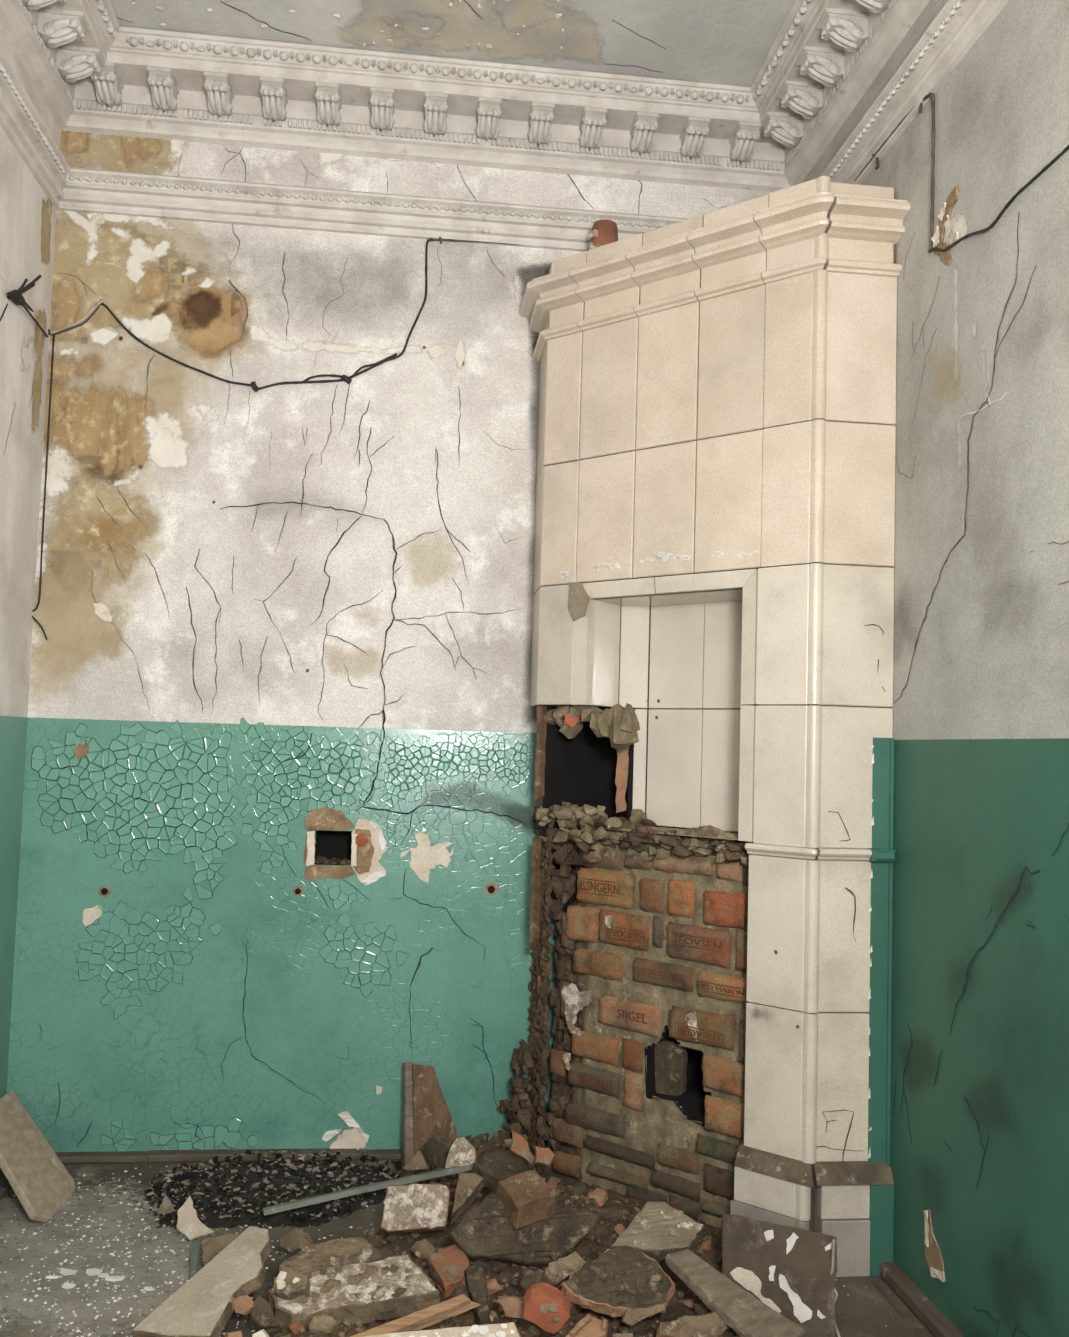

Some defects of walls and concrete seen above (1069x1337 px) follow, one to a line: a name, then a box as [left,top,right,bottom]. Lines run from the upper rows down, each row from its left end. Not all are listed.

crack [221,145,246,181]
spalling [931,185,959,265]
water stain [21,199,208,595]
crack [86,224,530,836]
crack [864,215,1037,708]
crack [221,944,314,1095]
spalling [304,807,454,886]
crack [281,845,486,1050]
crack [845,887,856,942]
crack [893,822,1069,1189]
crack [816,1110,854,1163]
peeling [923,1209,946,1282]